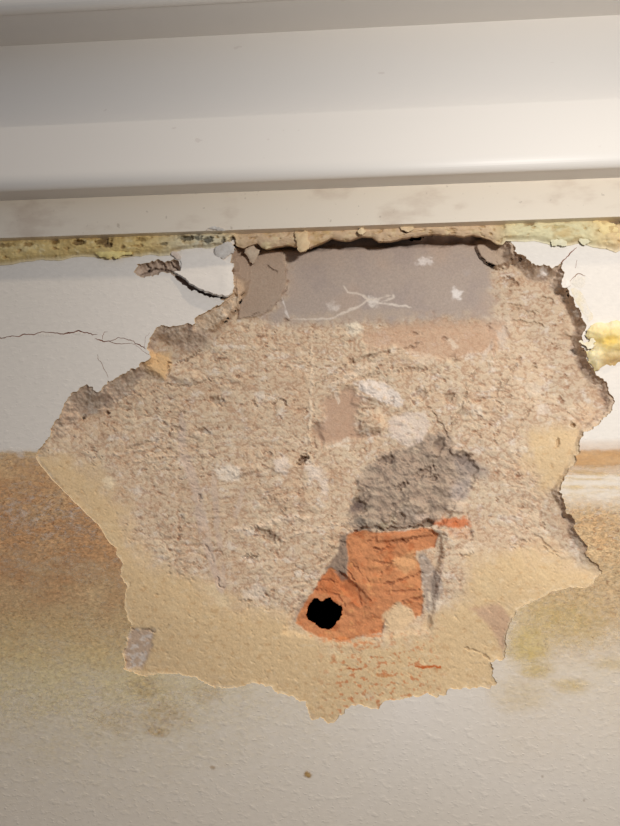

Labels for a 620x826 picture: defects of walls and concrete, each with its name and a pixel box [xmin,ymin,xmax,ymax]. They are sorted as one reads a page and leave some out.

crack [0,330,149,376]
spalling [36,235,615,724]
water stain [569,450,620,488]
water stain [0,452,198,713]
water stain [513,507,620,673]